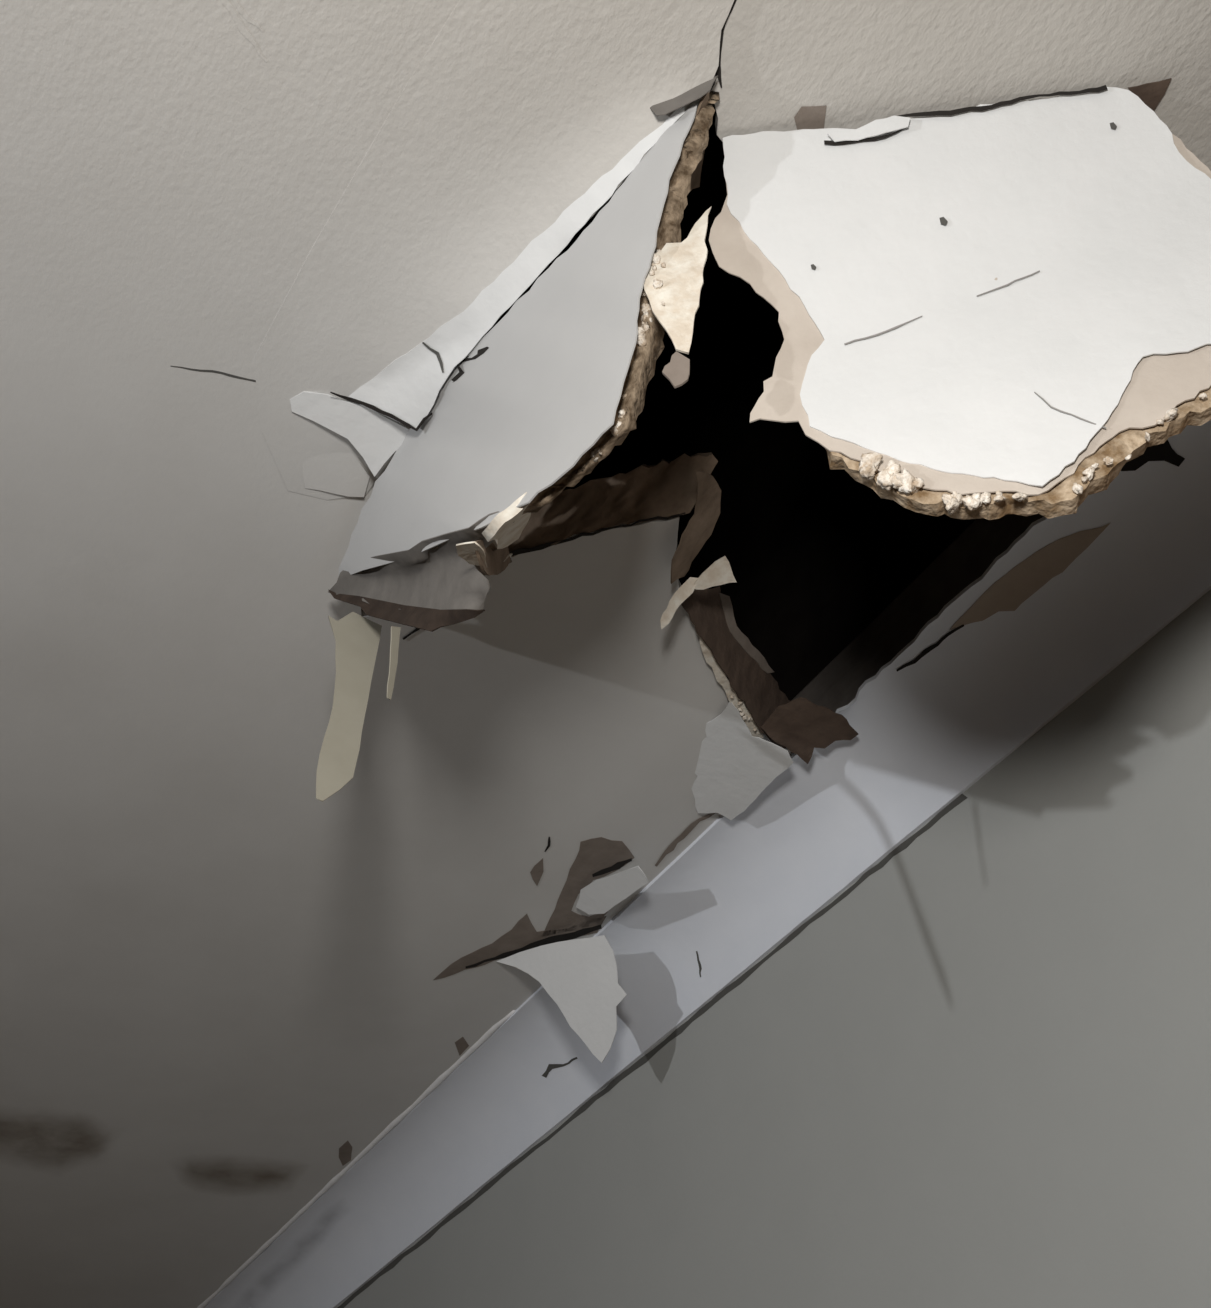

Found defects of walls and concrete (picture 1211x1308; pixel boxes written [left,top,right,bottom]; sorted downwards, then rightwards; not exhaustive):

crack [710,0,736,91]
peeling [650,75,718,116]
peeling [794,106,910,142]
peeling [422,342,444,373]
peeling [290,391,432,497]
spalling [1121,439,1185,471]
peeling [950,523,1110,630]
spalling [489,452,858,820]
peeling [434,837,649,1078]